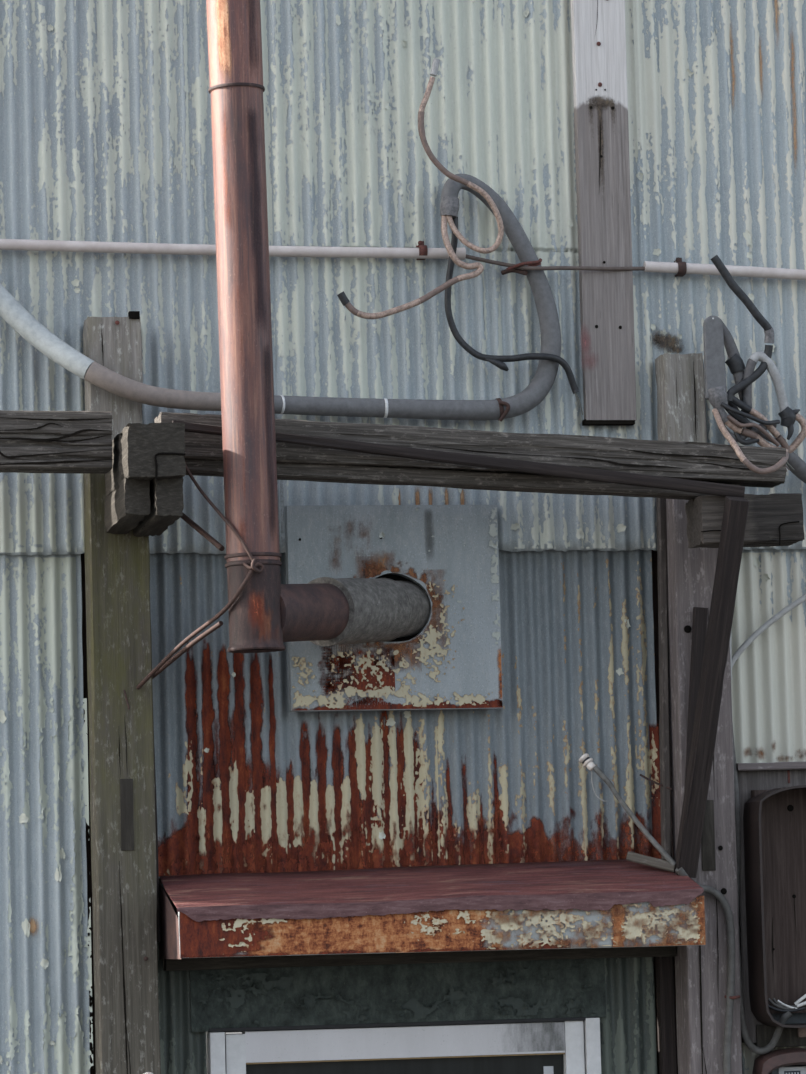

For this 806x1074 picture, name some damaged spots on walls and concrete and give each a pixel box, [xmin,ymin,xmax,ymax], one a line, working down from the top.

peeling [0,319,84,411]
peeling [0,0,215,391]
peeling [260,0,579,400]
peeling [519,391,595,436]
peeling [607,0,806,460]
peeling [0,473,93,1074]
peeling [219,918,287,952]
rust [158,556,661,877]
peeling [168,490,659,870]
rust [179,896,706,958]
peeling [404,902,704,1074]
peeling [731,526,806,763]